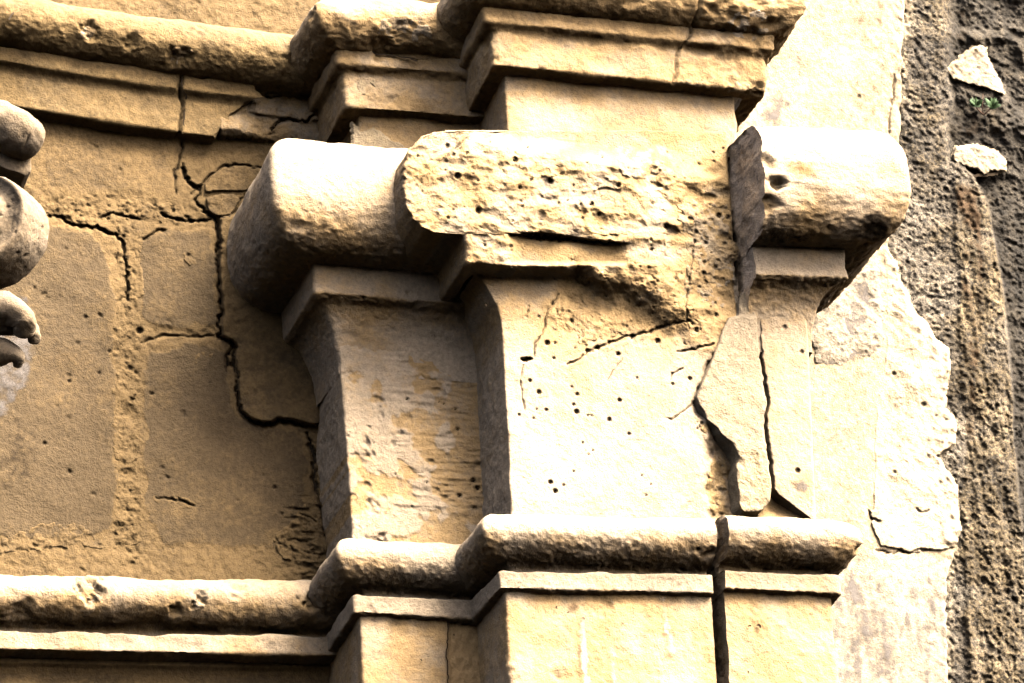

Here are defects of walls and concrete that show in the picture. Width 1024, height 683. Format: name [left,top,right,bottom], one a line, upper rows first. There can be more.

crack [62,75,325,555]
crack [520,295,558,404]
crack [570,242,695,379]
peeling [812,255,962,553]